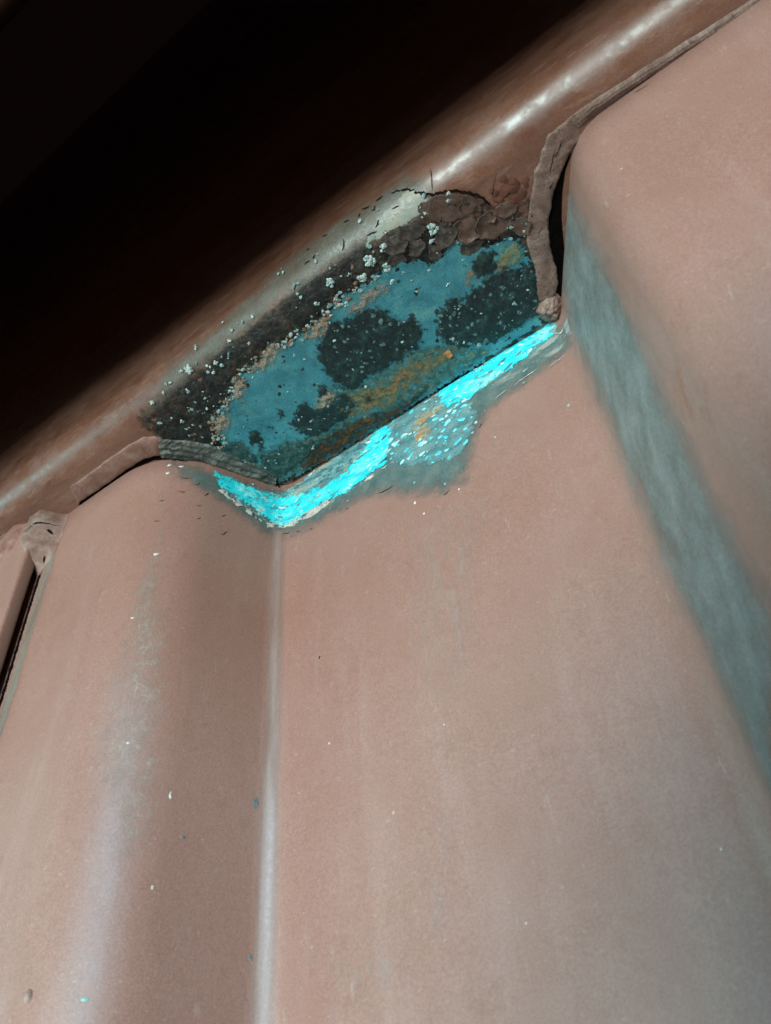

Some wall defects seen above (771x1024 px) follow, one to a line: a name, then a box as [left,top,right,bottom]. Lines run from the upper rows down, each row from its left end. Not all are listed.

corrosion [306,318,329,342]
corrosion [256,344,280,371]
corrosion [214,414,229,431]
corrosion [300,356,446,469]
peeling [138,182,567,1024]